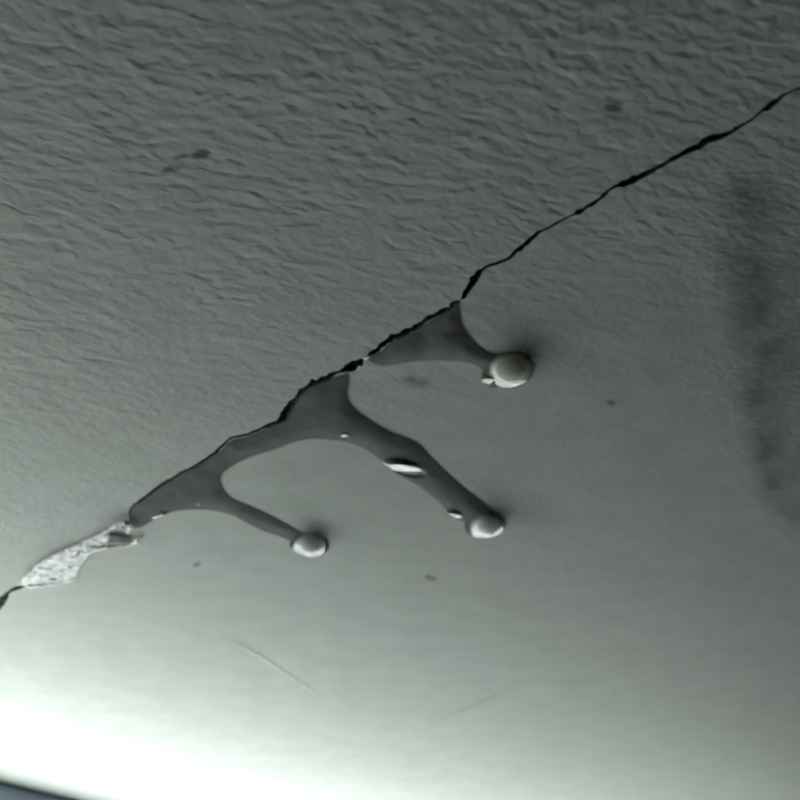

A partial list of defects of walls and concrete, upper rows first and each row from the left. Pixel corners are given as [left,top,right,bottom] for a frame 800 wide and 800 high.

leakage [363,305,496,387]
crack [129,87,800,514]
leakage [20,374,493,589]
crack [0,585,26,609]